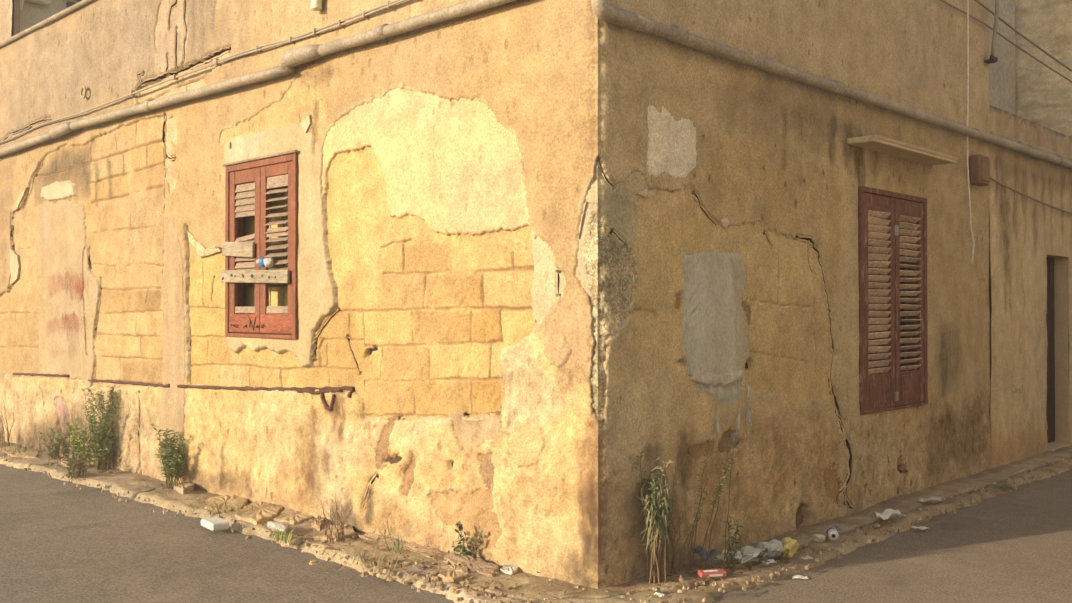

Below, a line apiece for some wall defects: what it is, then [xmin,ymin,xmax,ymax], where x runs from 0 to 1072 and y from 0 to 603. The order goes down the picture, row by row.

flaking render [0,116,177,387]
crack [136,0,231,280]
flaking render [187,88,837,550]
crack [598,159,614,189]
crack [692,191,717,228]
crack [763,232,854,510]